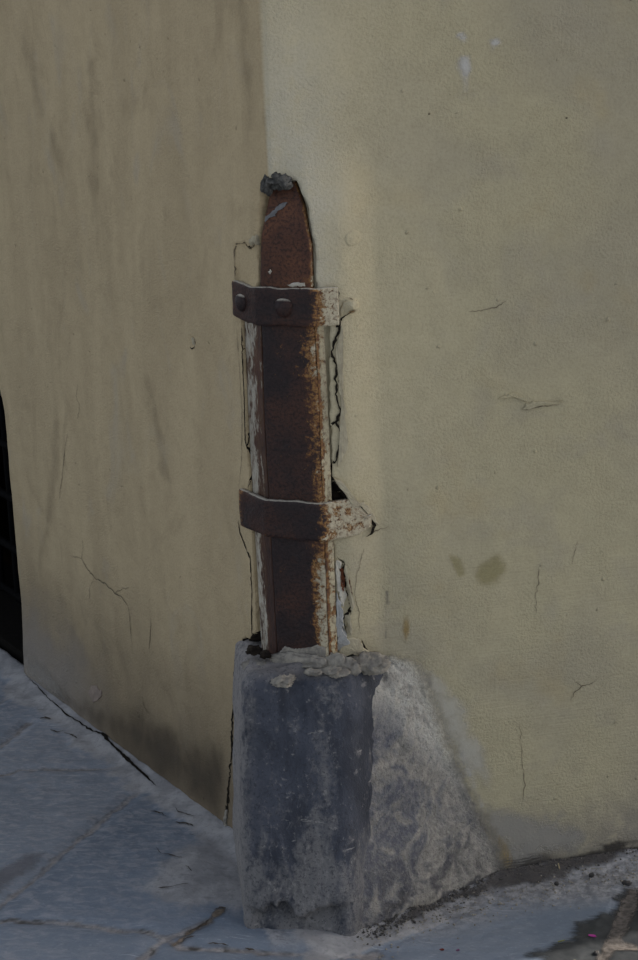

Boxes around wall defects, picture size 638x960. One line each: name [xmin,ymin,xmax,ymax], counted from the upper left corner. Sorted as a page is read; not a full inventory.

crack [330,290,353,476]
spalling [331,463,387,537]
crack [73,541,151,653]
peeling [335,560,370,657]
crack [26,675,154,784]
crack [223,709,234,826]
water stain [526,888,638,960]